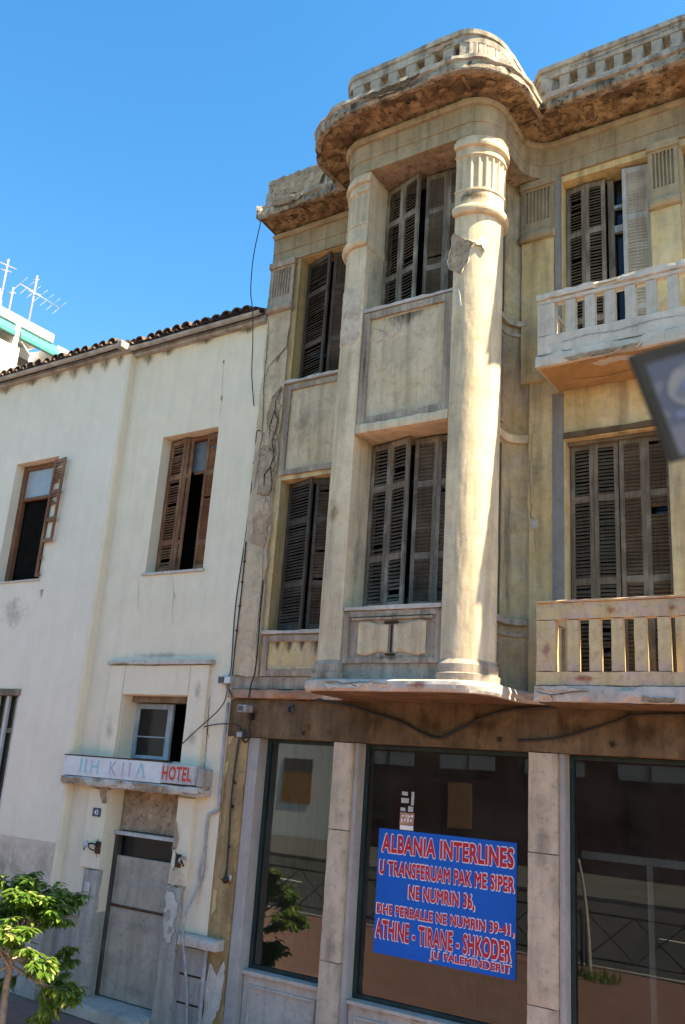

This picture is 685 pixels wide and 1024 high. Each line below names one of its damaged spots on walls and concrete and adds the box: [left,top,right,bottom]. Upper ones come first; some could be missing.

peeling [447,233,487,309]
crack [254,321,289,503]
peeling [163,867,184,944]
peeling [201,961,226,1024]